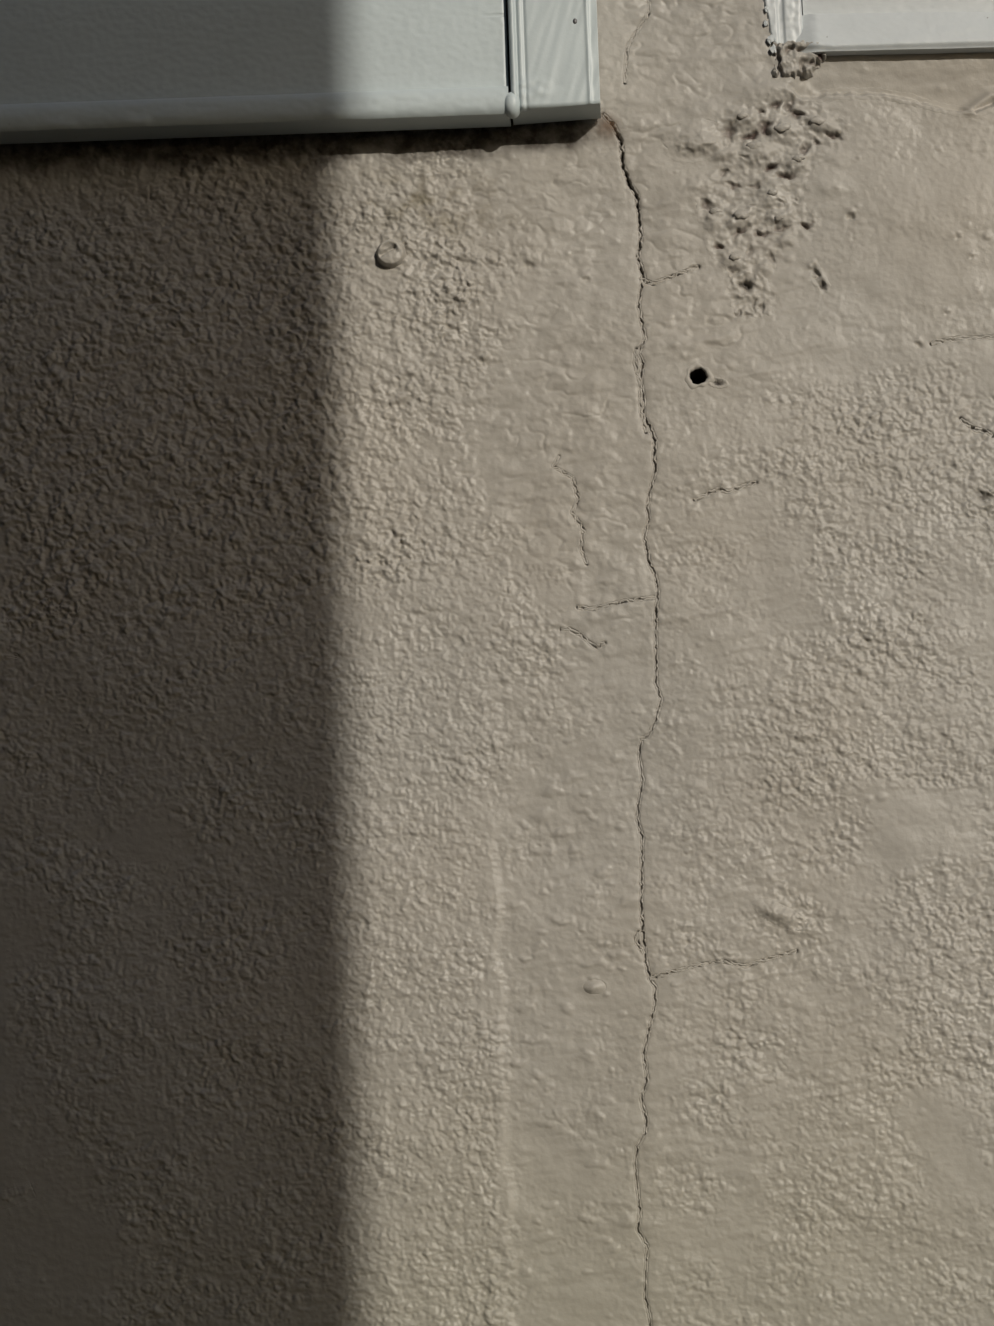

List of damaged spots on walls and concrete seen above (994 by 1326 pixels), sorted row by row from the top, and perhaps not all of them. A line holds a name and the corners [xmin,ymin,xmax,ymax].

crack [623,0,652,83]
spalling [665,6,850,319]
crack [931,335,994,346]
crack [551,455,588,565]
crack [561,113,797,1326]